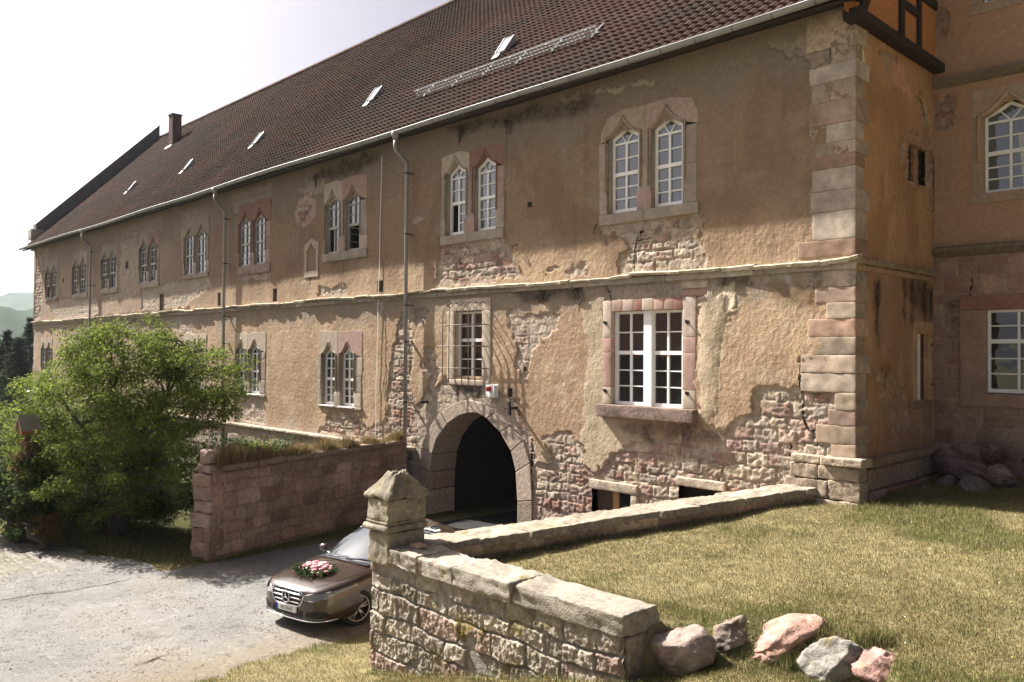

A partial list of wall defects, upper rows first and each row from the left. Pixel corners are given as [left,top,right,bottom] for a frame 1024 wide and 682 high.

flaking render [295,177,325,227]
flaking render [433,234,520,288]
flaking render [601,213,736,311]
flaking render [320,307,854,520]
crack [789,369,818,456]